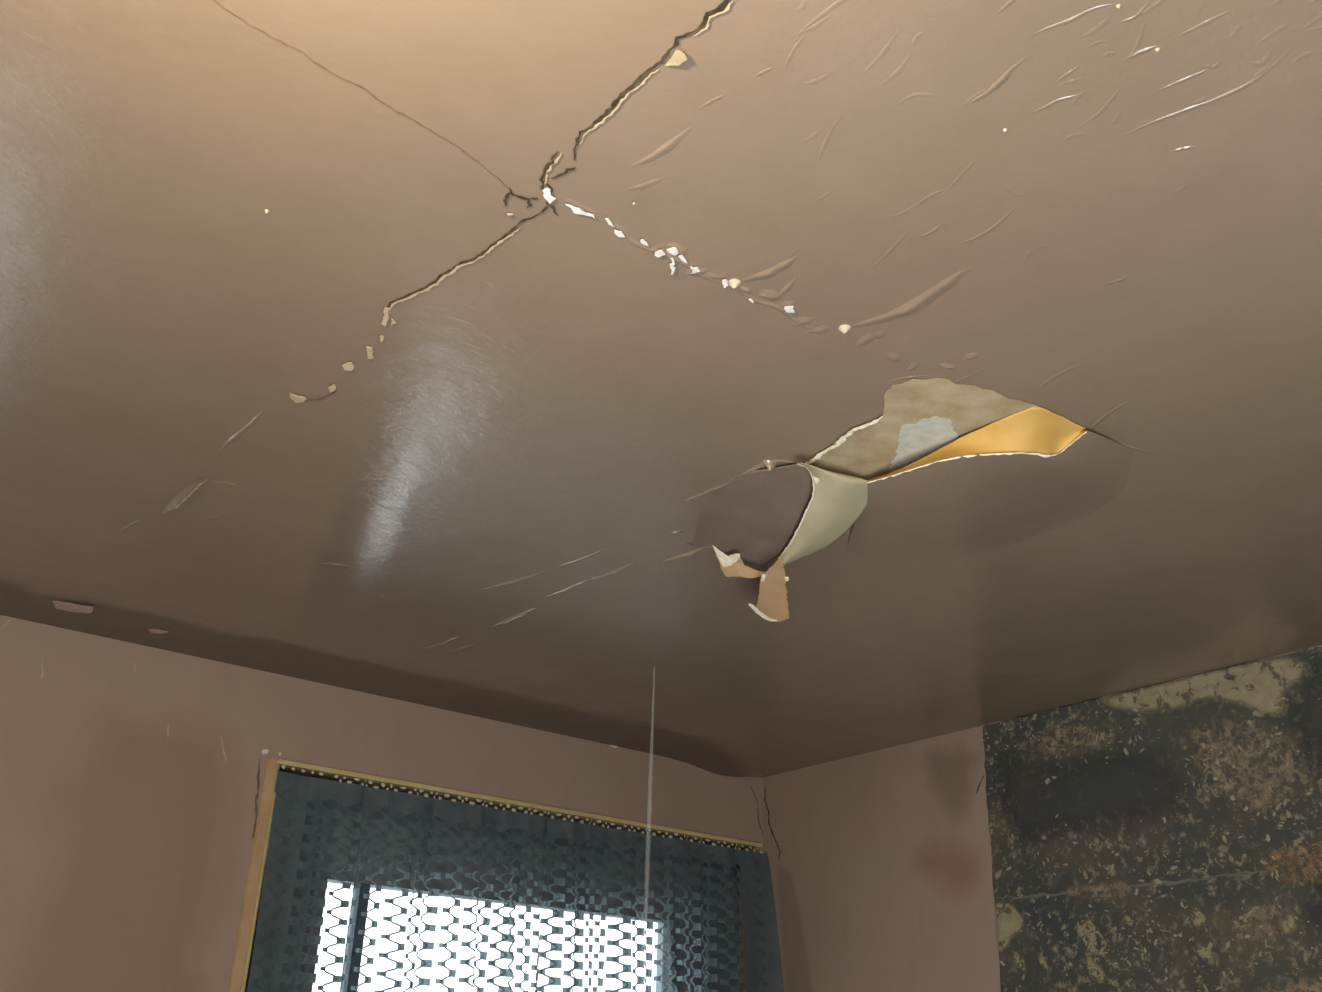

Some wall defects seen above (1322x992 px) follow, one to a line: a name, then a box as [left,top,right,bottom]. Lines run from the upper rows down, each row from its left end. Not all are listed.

crack [213,0,733,455]
leakage [982,646,1322,992]